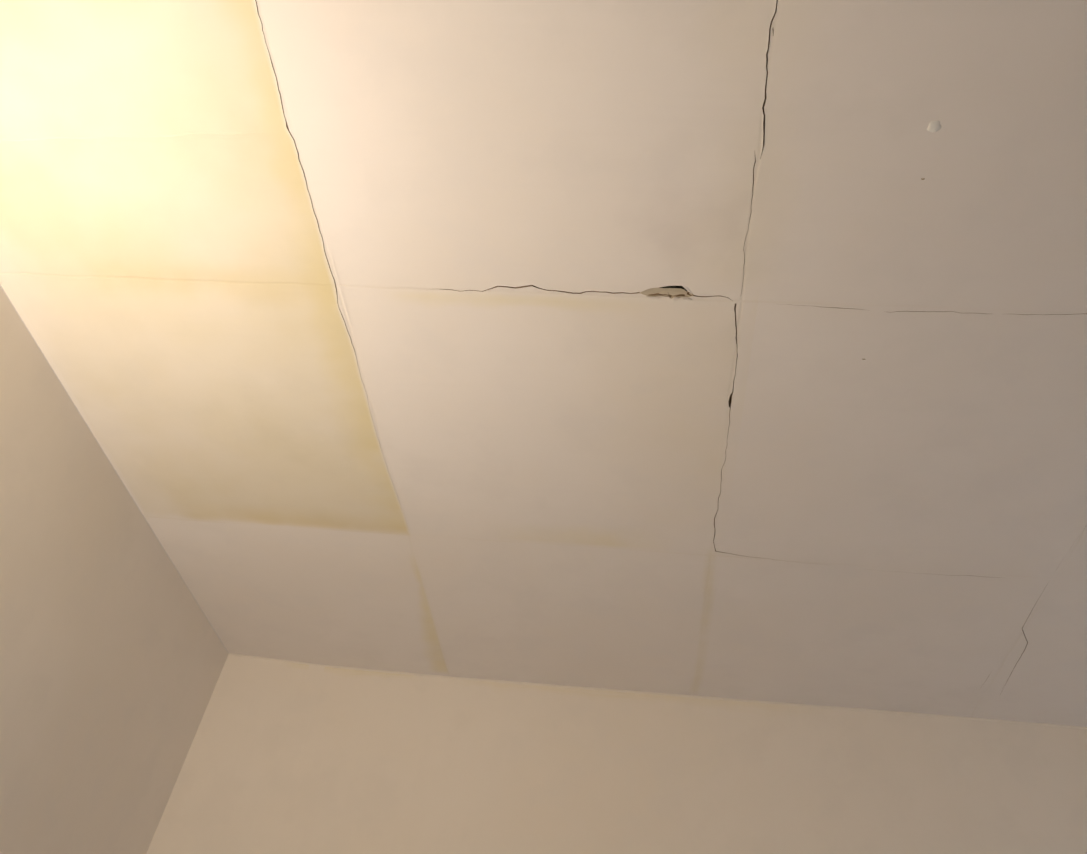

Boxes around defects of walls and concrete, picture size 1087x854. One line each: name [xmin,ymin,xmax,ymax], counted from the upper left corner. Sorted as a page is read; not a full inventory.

crack [254,0,409,525]
water stain [0,0,851,721]
crack [428,284,640,294]
flaking render [640,286,694,301]
crack [687,0,824,565]